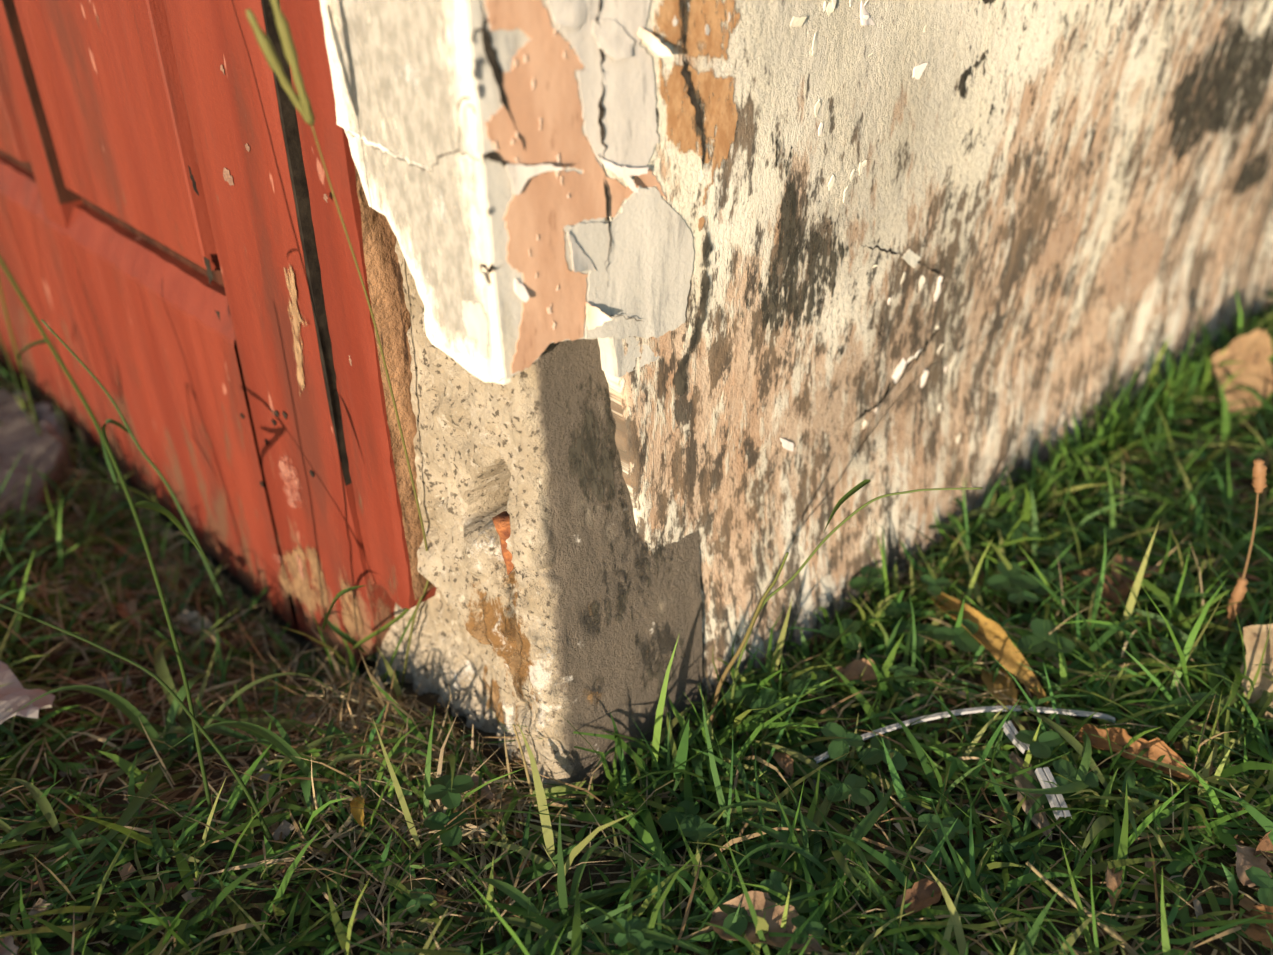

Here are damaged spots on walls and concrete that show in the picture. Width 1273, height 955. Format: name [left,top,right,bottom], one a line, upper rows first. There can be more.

damp [332,0,477,347]
crack [343,0,525,172]
damp [472,37,485,98]
crack [480,264,497,273]
peeling [475,0,740,383]
crack [590,0,644,322]
crack [679,0,706,170]
mould [673,221,712,398]
damp [740,137,895,360]
damp [957,0,1273,220]
spalling [492,511,514,576]
rust [471,600,529,698]